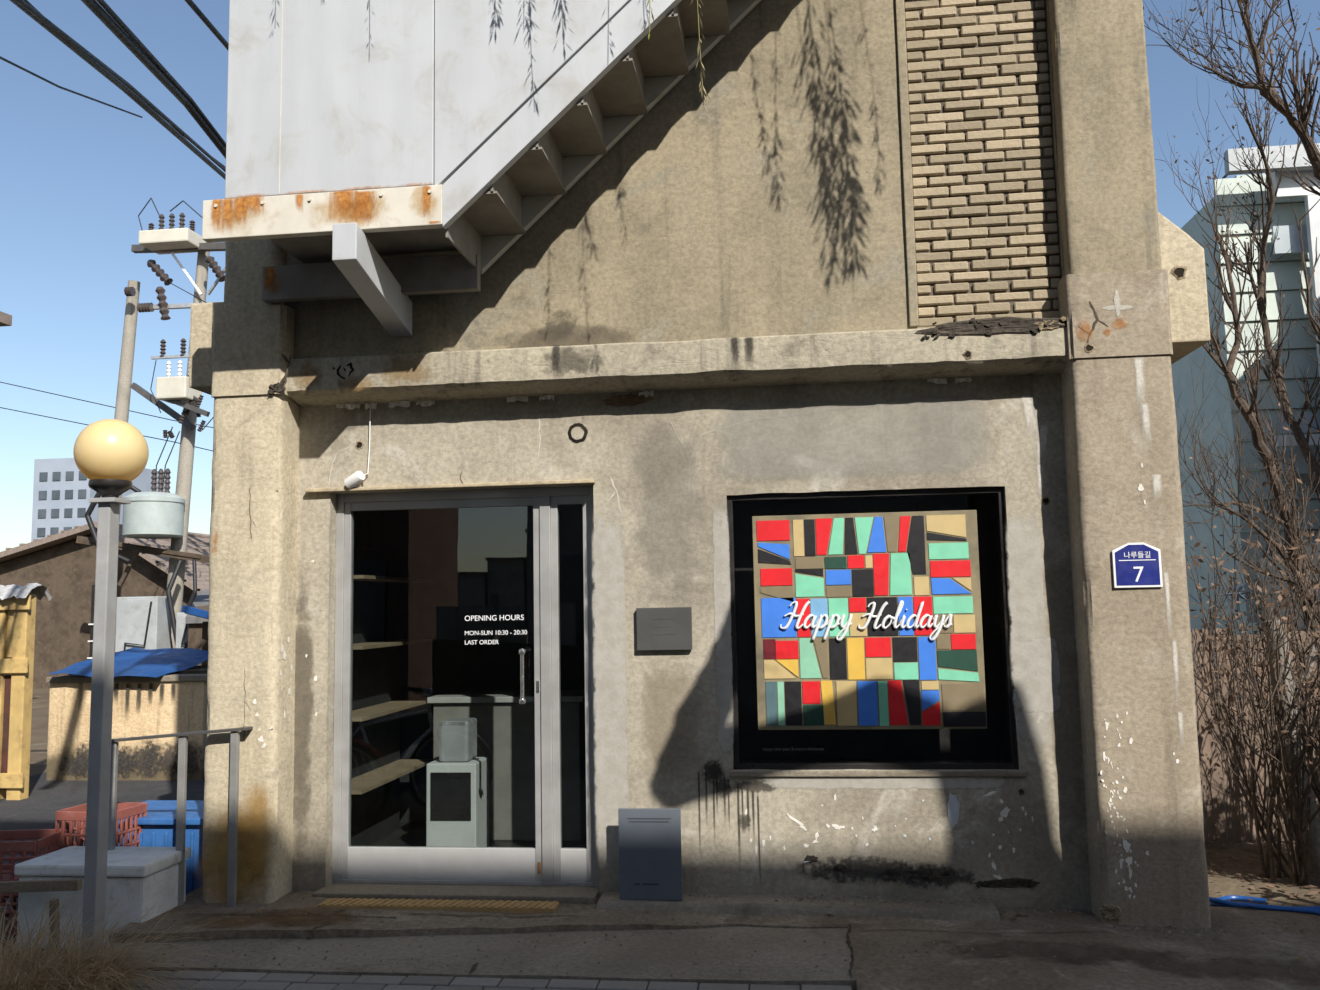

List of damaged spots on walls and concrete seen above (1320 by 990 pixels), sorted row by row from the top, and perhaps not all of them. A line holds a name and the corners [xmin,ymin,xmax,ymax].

rust [212,196,260,225]
rust [330,191,376,224]
rust [417,186,437,223]
damp [519,327,623,368]
spalling [915,316,1067,358]
damp [698,760,775,866]
peeling [1100,712,1149,898]
peeling [786,813,877,863]
damp [801,856,975,888]